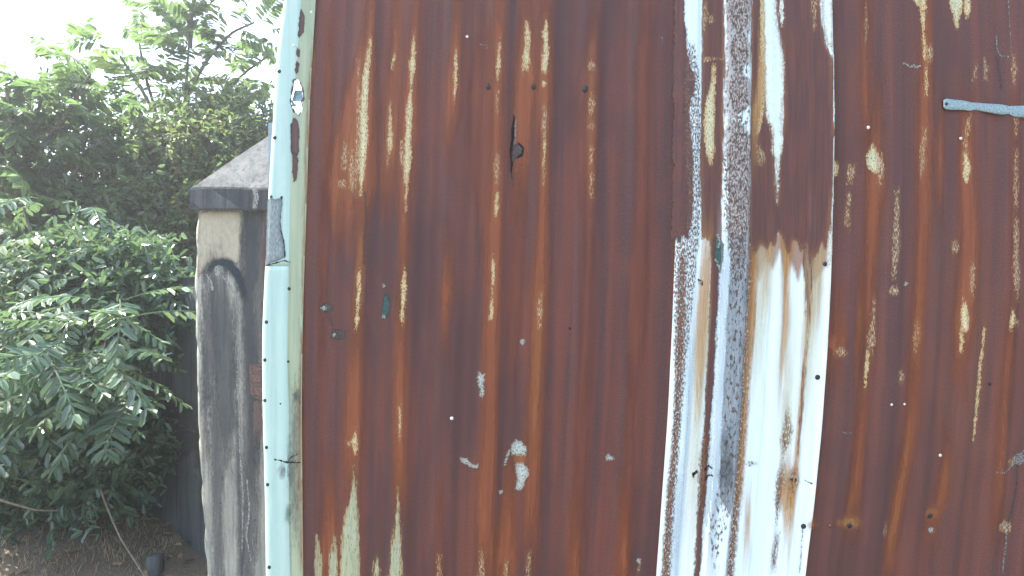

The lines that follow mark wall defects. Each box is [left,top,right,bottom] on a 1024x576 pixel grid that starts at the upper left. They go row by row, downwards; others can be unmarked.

leakage [158,186,268,576]
rust [320,489,338,576]
rust [327,0,419,491]
rust [445,0,552,576]
peeling [498,439,529,495]
crack [509,115,524,185]
rust [575,20,598,508]
rust [662,0,835,576]
rust [828,0,884,358]
rust [882,1,944,560]
rust [955,116,979,365]
rust [995,131,1019,515]